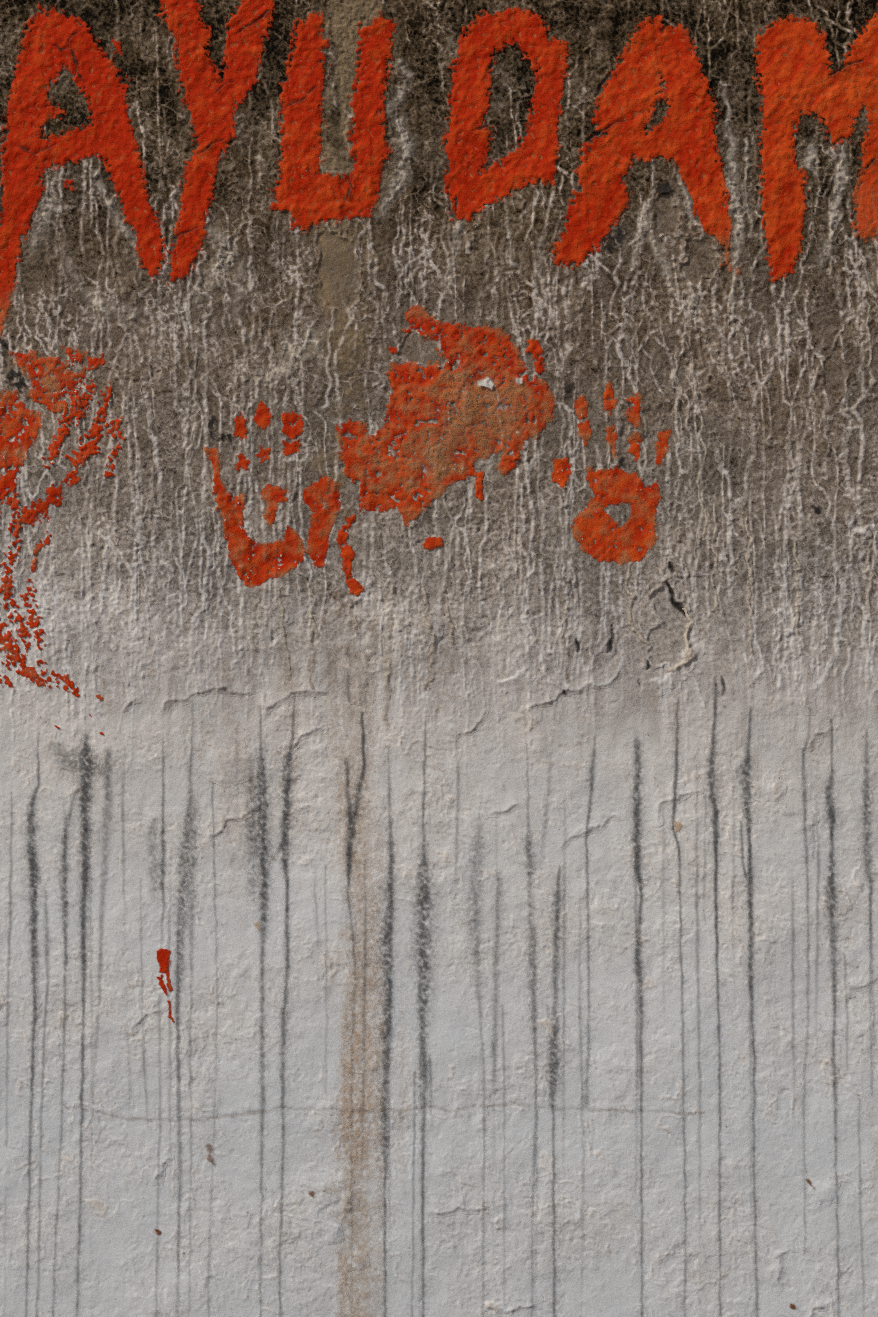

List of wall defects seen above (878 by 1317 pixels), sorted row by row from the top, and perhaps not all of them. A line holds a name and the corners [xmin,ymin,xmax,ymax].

efflorescence [381,60,412,215]
water stain [721,82,753,315]
efflorescence [819,145,849,265]
water stain [254,318,328,386]
water stain [630,160,718,612]
water stain [28,787,37,1082]
water stain [65,743,90,1001]
water stain [259,734,293,929]
water stain [346,713,365,880]
water stain [634,746,642,923]
water stain [709,682,718,962]
water stain [743,736,752,930]